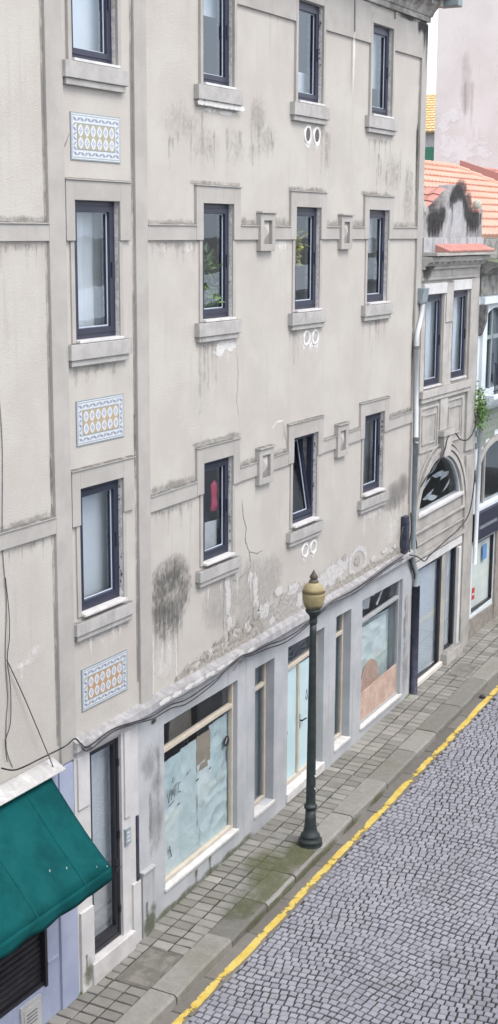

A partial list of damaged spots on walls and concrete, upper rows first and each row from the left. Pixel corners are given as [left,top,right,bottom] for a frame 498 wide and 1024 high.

mould [428,180,481,236]
peeling [213,339,236,357]
water stain [153,561,188,627]
crack [220,502,263,627]
spalling [159,543,401,706]